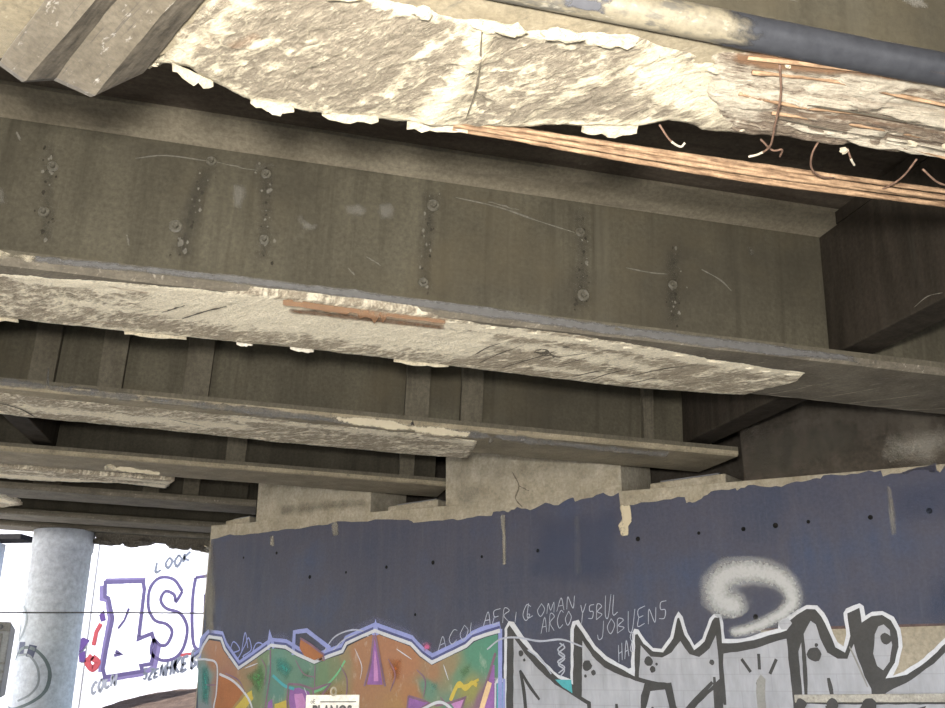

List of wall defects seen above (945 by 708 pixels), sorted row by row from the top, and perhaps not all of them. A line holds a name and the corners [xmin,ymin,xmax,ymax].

spalling [148,0,945,159]
corrosion [735,54,894,79]
corrosion [283,299,446,329]
spalling [0,255,853,395]
spalling [0,368,668,458]
spalling [0,463,175,488]
spalling [0,494,23,508]
peeling [618,505,632,536]